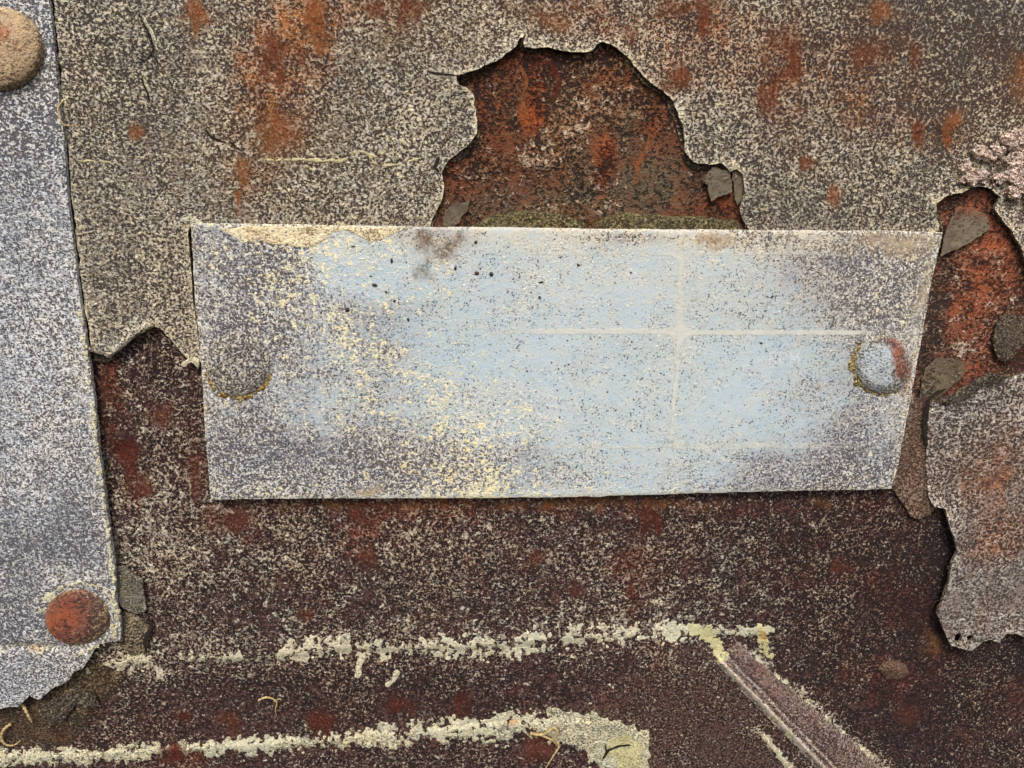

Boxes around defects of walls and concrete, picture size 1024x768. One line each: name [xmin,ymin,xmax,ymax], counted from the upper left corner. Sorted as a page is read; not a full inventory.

rust [759,32,802,111]
spalling [430,38,748,230]
peeling [89,321,155,362]
peeling [911,187,1024,651]
peeling [117,565,150,656]
rust [160,741,186,763]